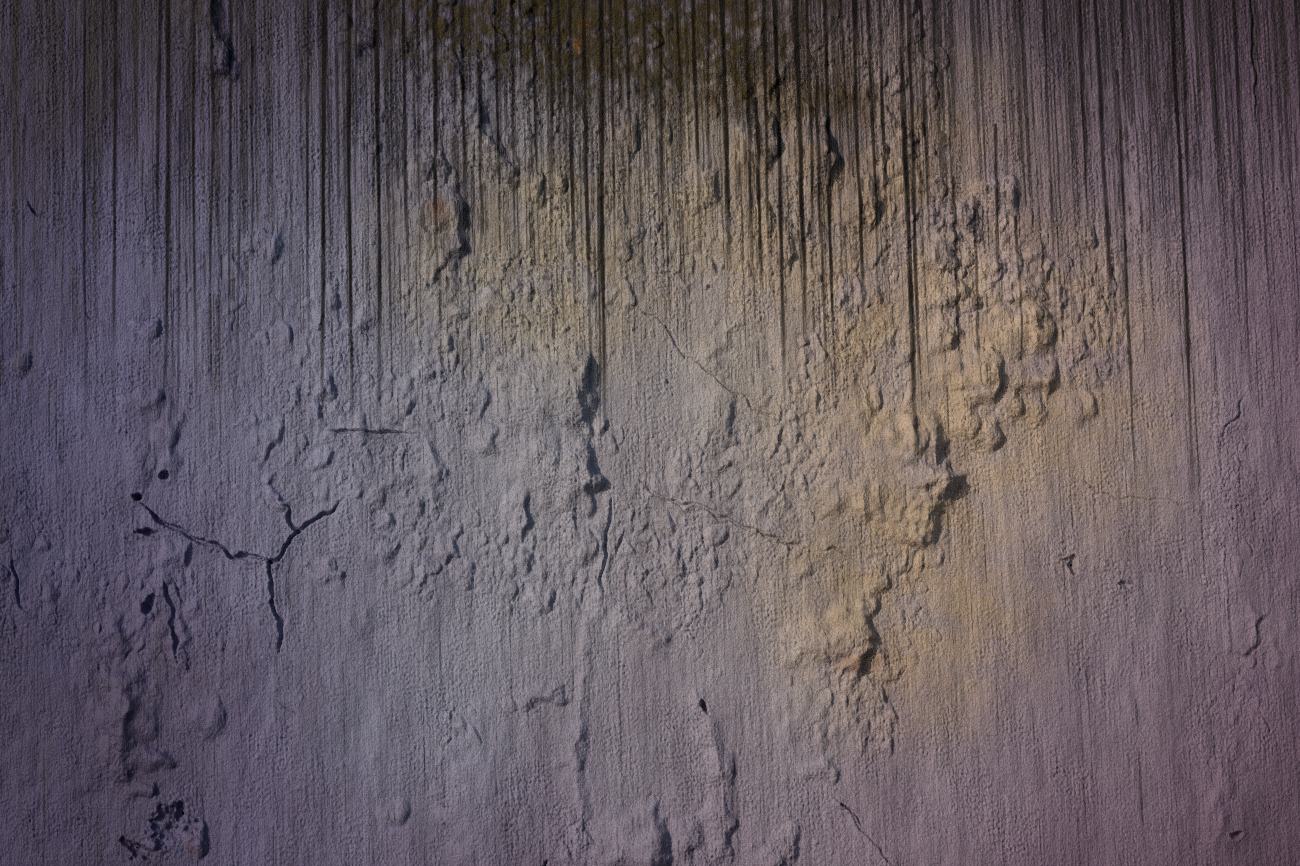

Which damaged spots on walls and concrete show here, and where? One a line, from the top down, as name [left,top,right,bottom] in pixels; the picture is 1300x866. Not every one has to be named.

peeling [210,0,1144,663]
crack [129,482,361,678]
crack [587,476,636,616]
peeling [796,534,967,764]
crack [822,773,909,866]